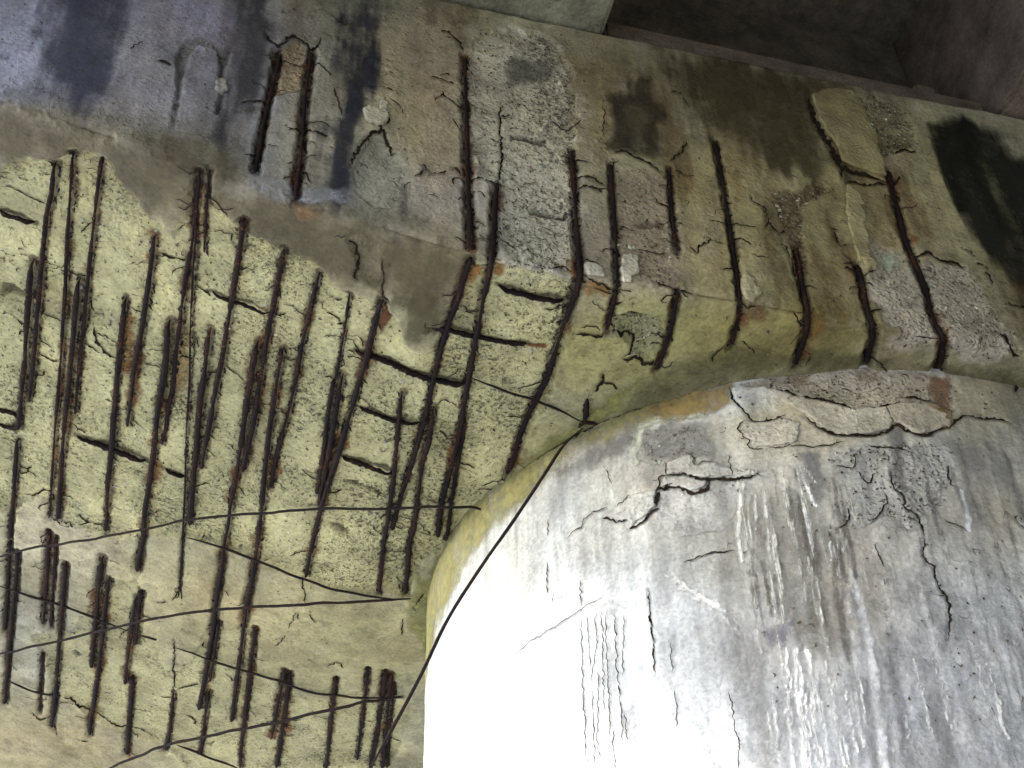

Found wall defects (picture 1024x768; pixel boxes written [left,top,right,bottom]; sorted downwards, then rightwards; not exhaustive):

damp [43,0,126,110]
damp [301,0,381,207]
damp [606,78,666,156]
damp [928,114,1024,285]
rust [173,332,189,391]
spalling [0,26,691,768]
rust [378,304,392,334]
spalling [694,82,1018,537]
rust [928,377,951,428]
crack [547,387,1009,639]